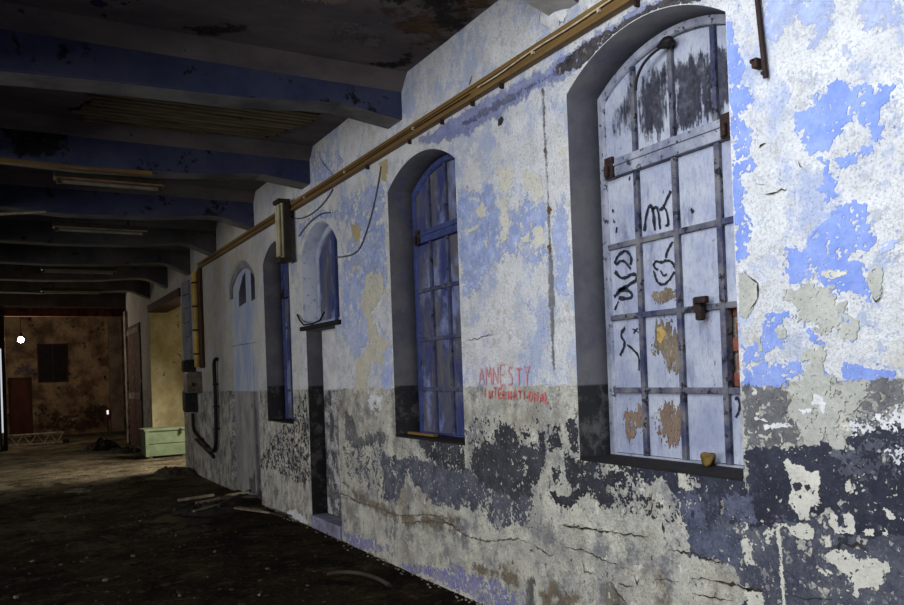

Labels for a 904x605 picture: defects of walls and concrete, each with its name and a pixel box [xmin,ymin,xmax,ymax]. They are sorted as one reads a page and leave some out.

water stain [370,0,491,68]
water stain [419,0,662,182]
peeling [726,21,759,319]
peeling [299,159,393,411]
peeling [343,78,904,605]
water stain [345,484,459,532]
crack [327,482,762,605]